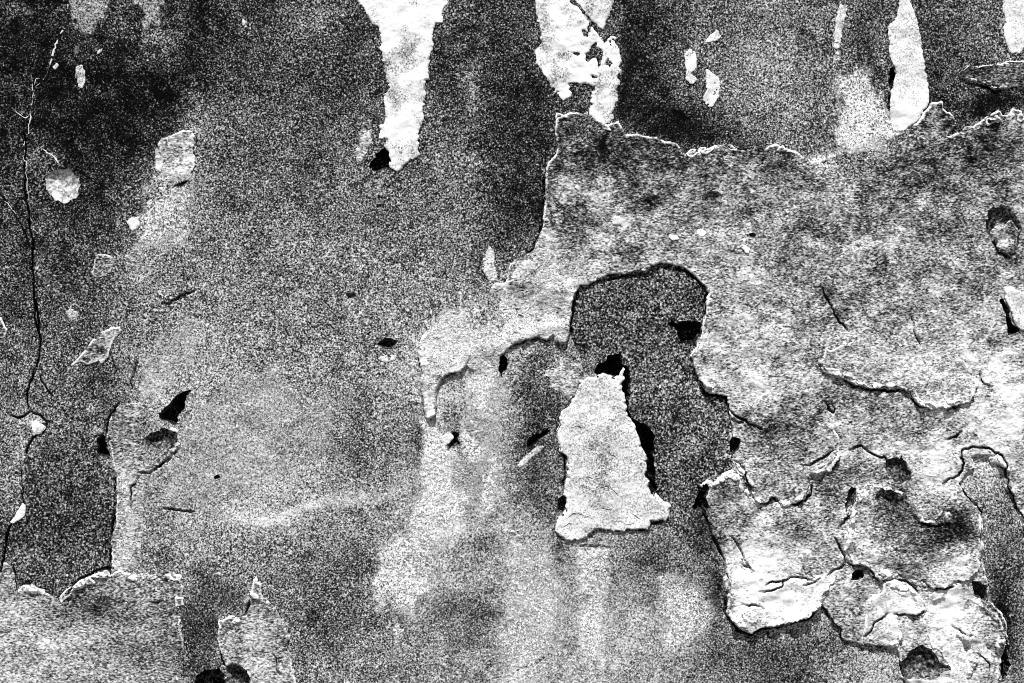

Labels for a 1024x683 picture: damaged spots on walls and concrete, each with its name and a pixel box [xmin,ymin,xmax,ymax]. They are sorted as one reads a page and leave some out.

leakage [71,0,108,34]
peeling [355,0,448,172]
peeling [535,0,622,131]
leakage [135,174,196,250]
crack [0,4,69,590]
crack [822,271,847,349]
spalling [483,242,841,543]
crack [806,445,888,466]
crack [945,431,1008,483]
flaking render [0,402,297,683]
crack [734,512,879,609]
flaking render [861,579,1006,683]